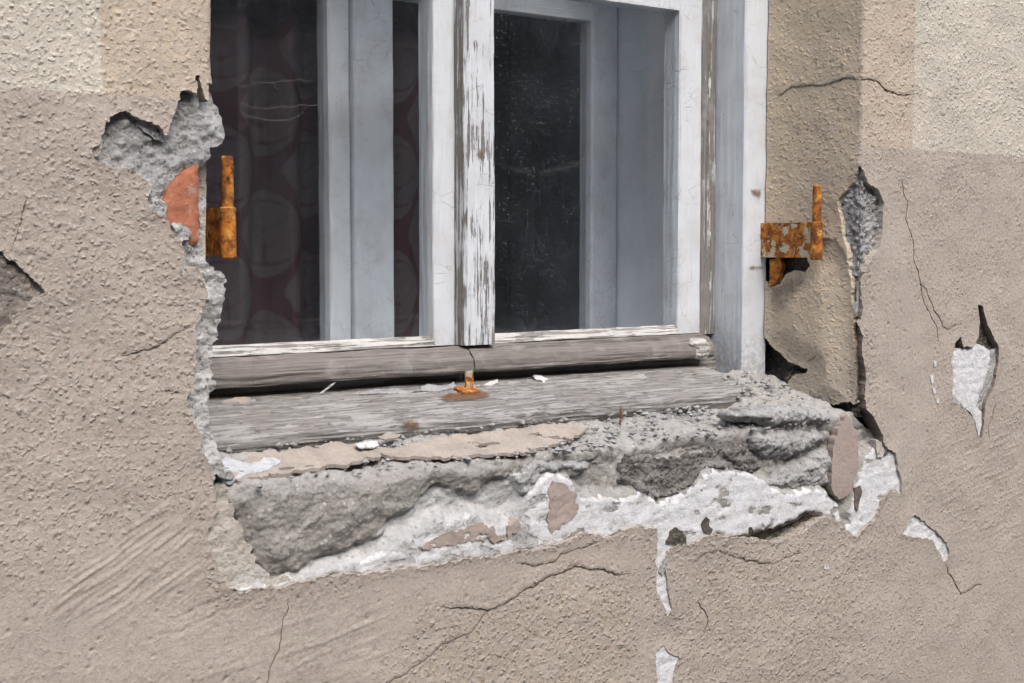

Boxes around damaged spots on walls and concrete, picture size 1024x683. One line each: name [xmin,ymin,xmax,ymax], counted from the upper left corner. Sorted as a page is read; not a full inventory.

spalling [840,177,879,313]
crack [902,181,962,335]
spalling [92,85,589,593]
corrosion [442,391,489,400]
spalling [765,338,808,386]
spalling [930,322,996,436]
peeling [354,402,900,615]
peeling [903,516,948,561]
crack [388,531,627,683]
peeling [656,646,679,683]